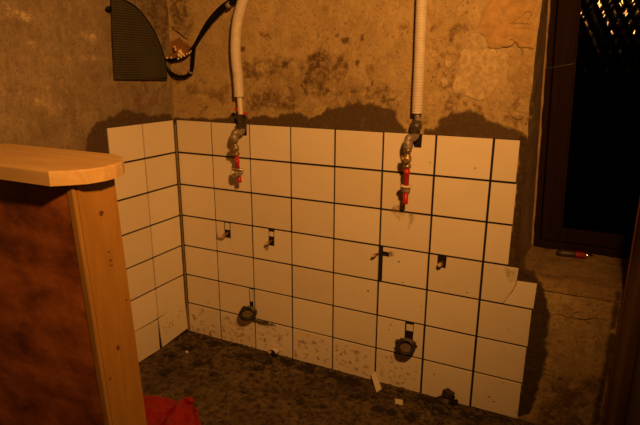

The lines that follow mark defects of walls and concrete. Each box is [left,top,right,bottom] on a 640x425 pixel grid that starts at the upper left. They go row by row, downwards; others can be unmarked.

crack [494,11,533,55]